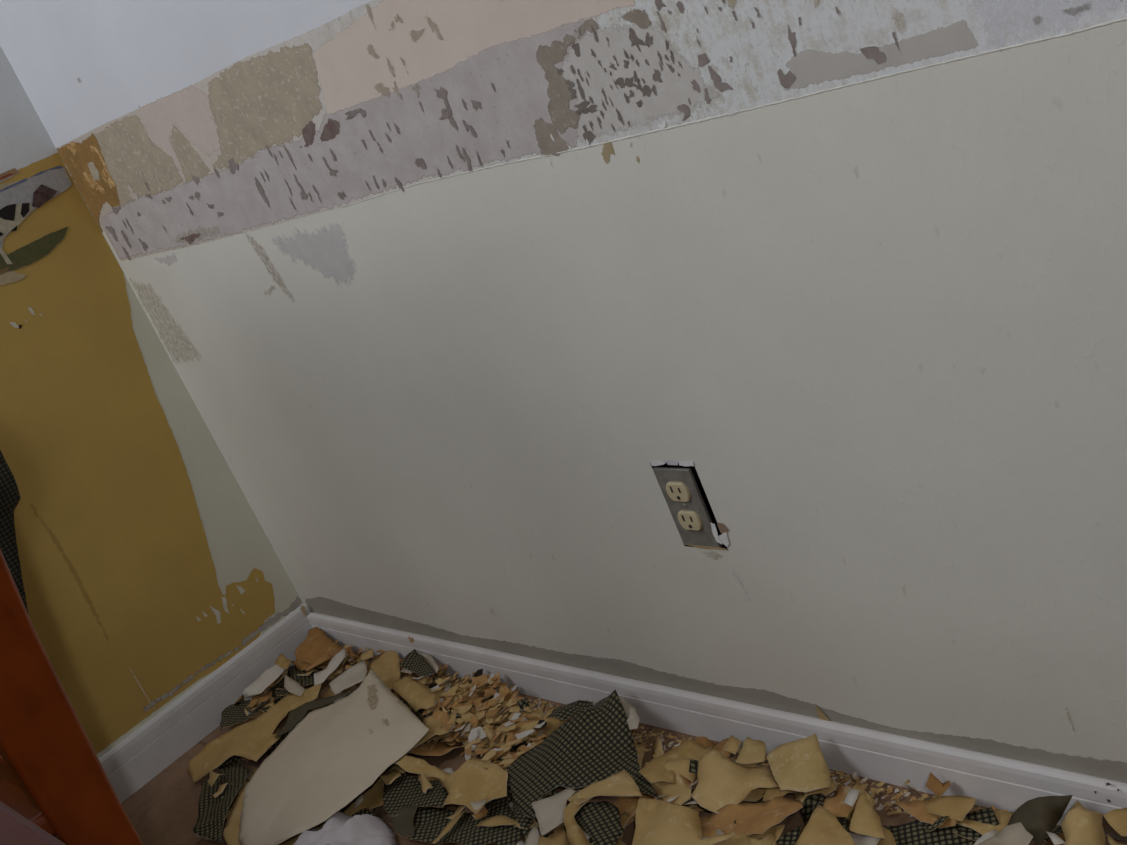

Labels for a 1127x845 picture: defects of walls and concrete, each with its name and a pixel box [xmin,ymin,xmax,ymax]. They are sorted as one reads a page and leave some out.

peeling [58,0,1127,261]